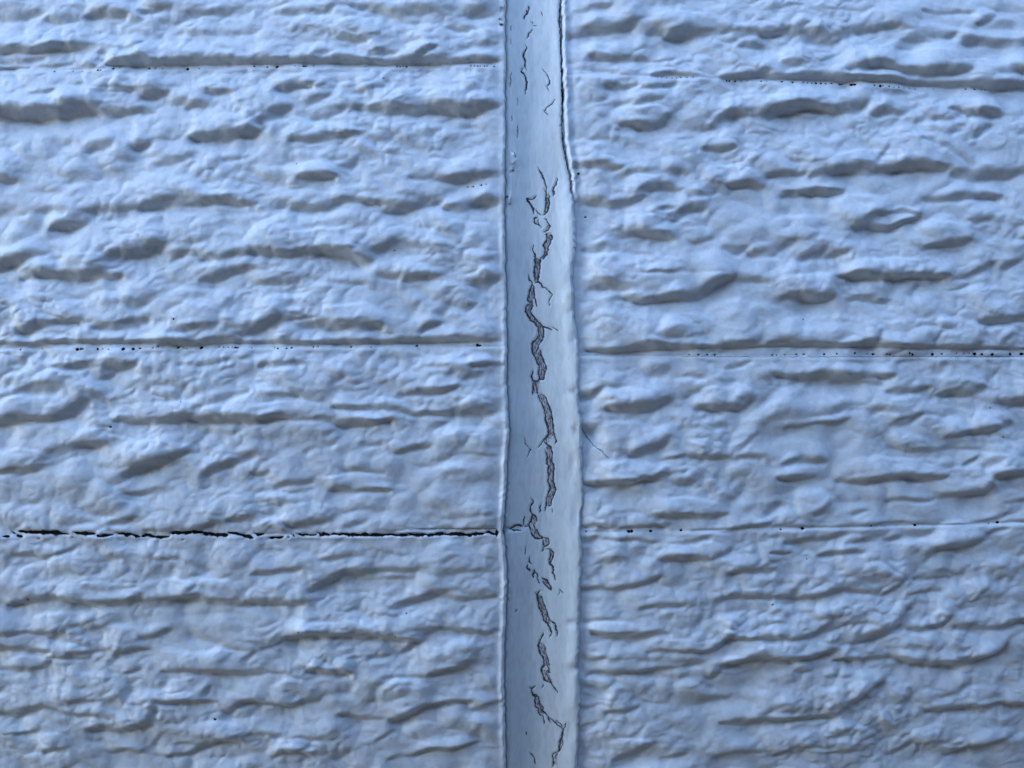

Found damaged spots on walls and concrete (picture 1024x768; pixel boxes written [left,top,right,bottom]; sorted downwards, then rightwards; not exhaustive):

crack [409,4,571,765]